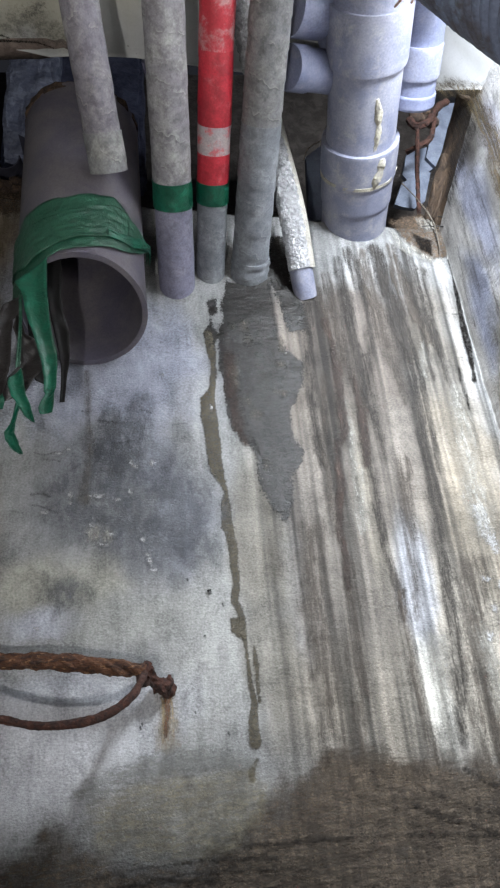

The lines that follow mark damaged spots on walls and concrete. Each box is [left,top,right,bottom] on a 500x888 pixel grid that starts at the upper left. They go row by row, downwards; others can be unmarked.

water stain [446,102,480,205]
water stain [0,236,500,888]
rust [160,697,178,751]